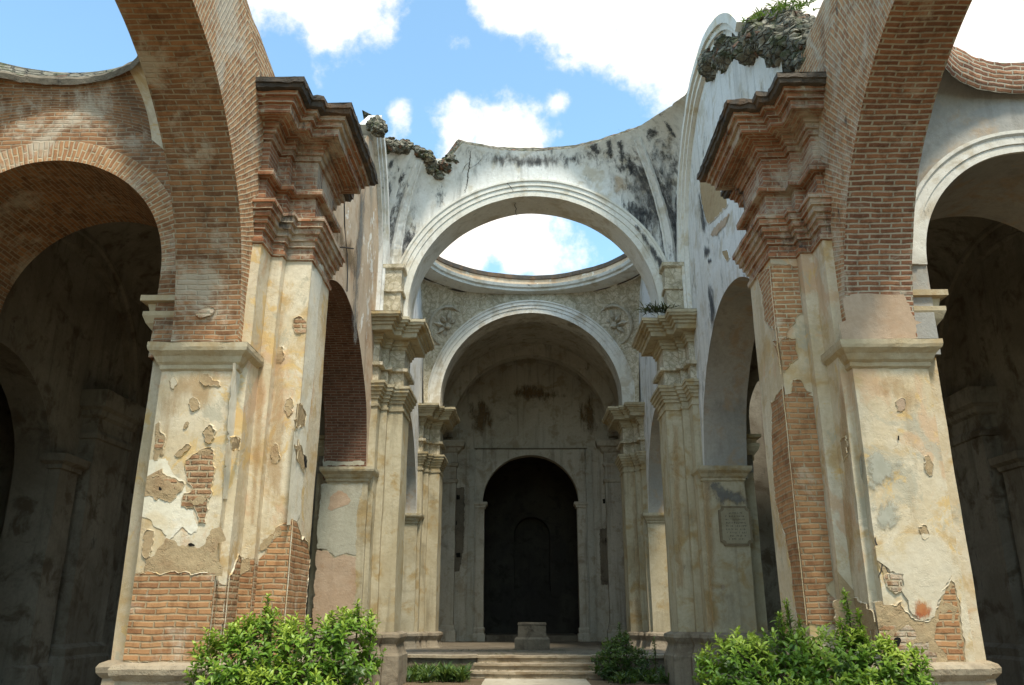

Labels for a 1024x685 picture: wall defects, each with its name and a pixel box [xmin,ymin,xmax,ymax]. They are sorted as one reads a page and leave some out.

leakage [493,121,678,267]
flaking render [293,315,306,334]
flaking render [144,421,217,523]
peeling [284,397,307,473]
flaking render [756,264,967,663]
flaking render [123,519,310,663]